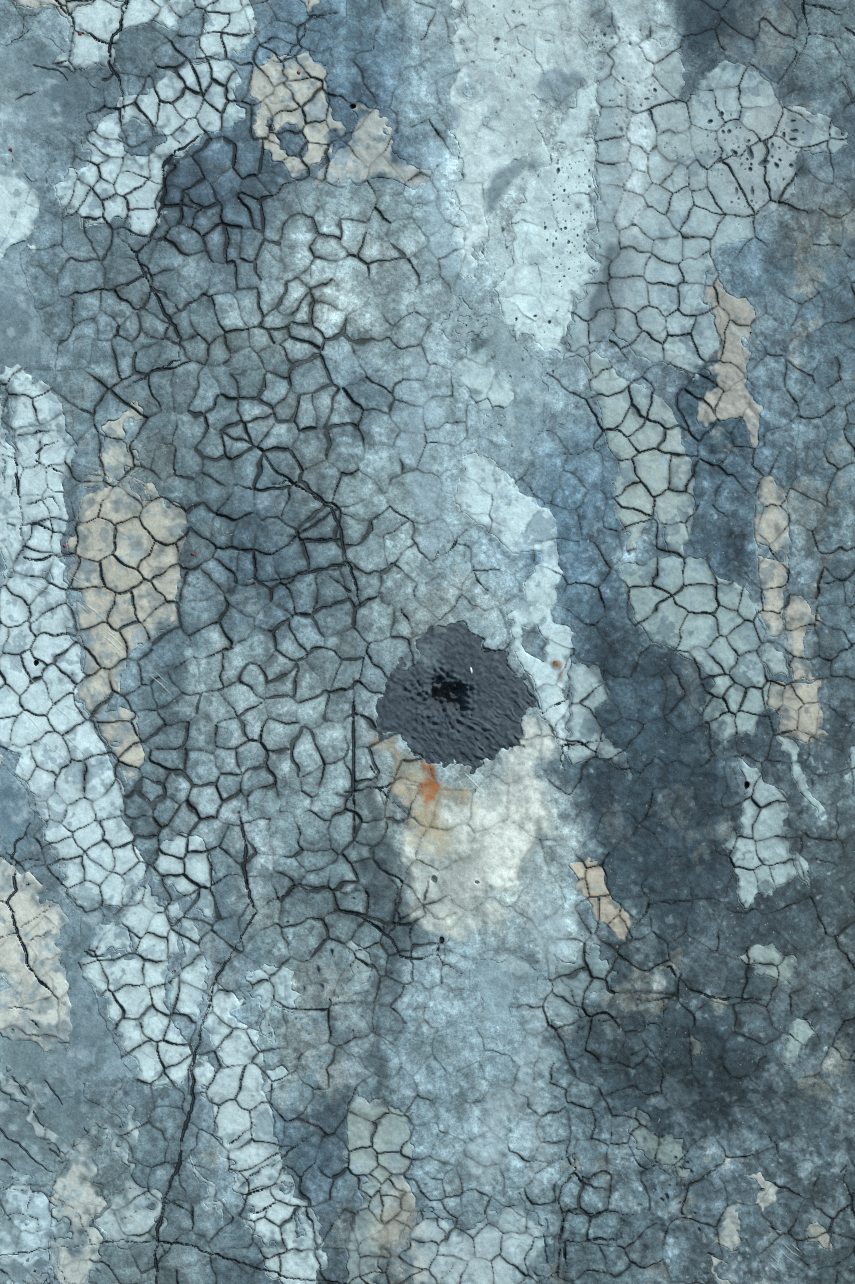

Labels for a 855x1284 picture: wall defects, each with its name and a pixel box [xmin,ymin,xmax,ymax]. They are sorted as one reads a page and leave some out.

crack [6,31,68,100]
crack [54,0,128,119]
crack [794,0,855,69]
crack [117,136,201,383]
crack [2,430,68,561]
crack [249,480,361,607]
crack [429,530,488,591]
crack [542,687,603,767]
crack [345,767,416,825]
corrosion [389,738,469,844]
crack [0,812,462,1284]
crack [533,1159,627,1280]